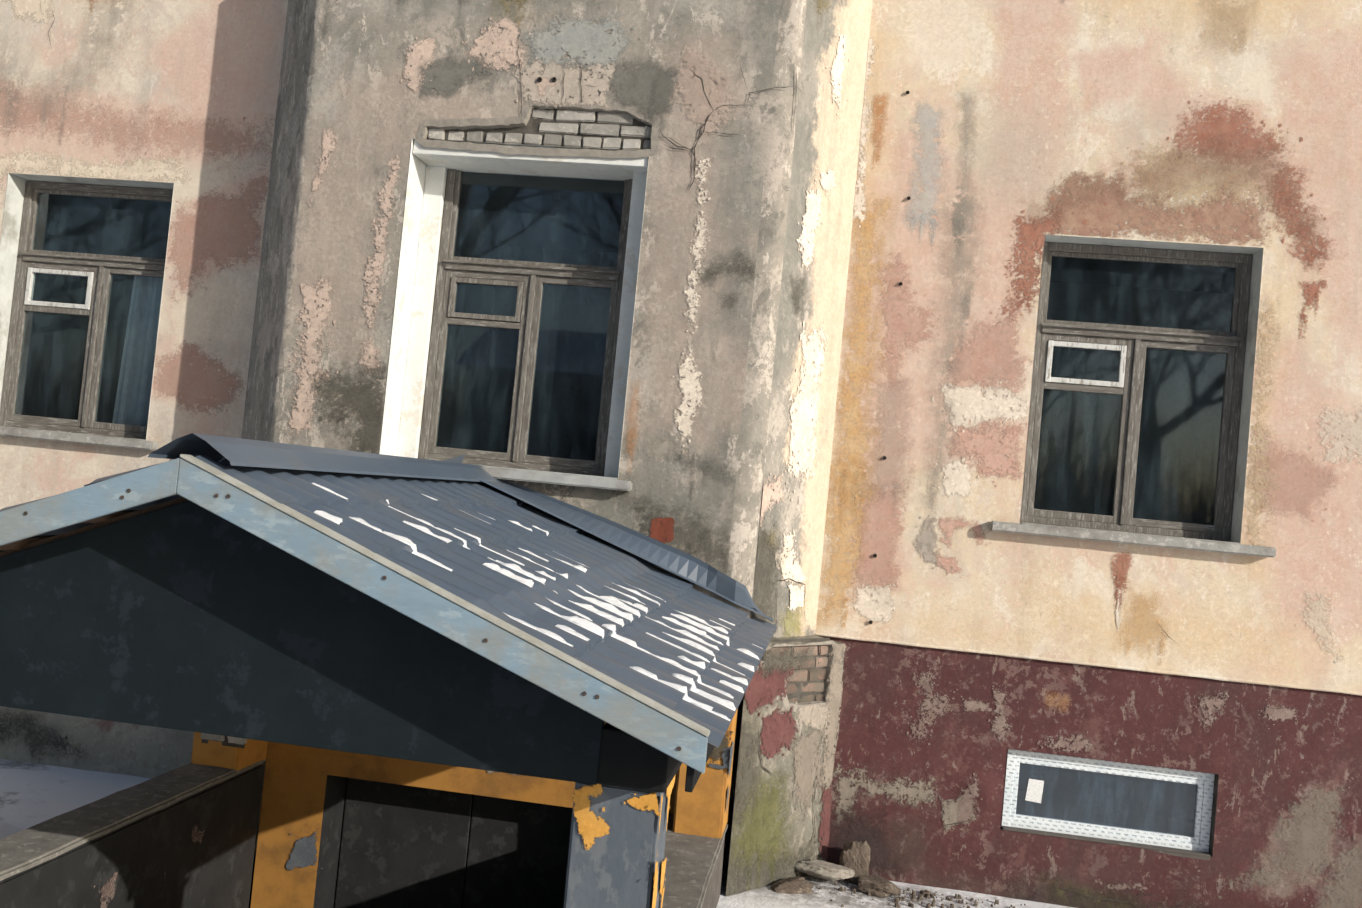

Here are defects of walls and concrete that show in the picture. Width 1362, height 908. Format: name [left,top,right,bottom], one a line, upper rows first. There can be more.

peeling [462,17,538,72]
peeling [0,148,193,193]
flaking render [415,98,659,158]
peeling [670,44,739,453]
crack [658,69,805,193]
peeling [797,168,837,270]
peeling [932,95,1330,502]
peeling [851,479,990,631]
peeling [907,661,1012,745]
peeling [567,782,610,851]
peeling [624,774,676,908]
leakage [728,816,898,897]